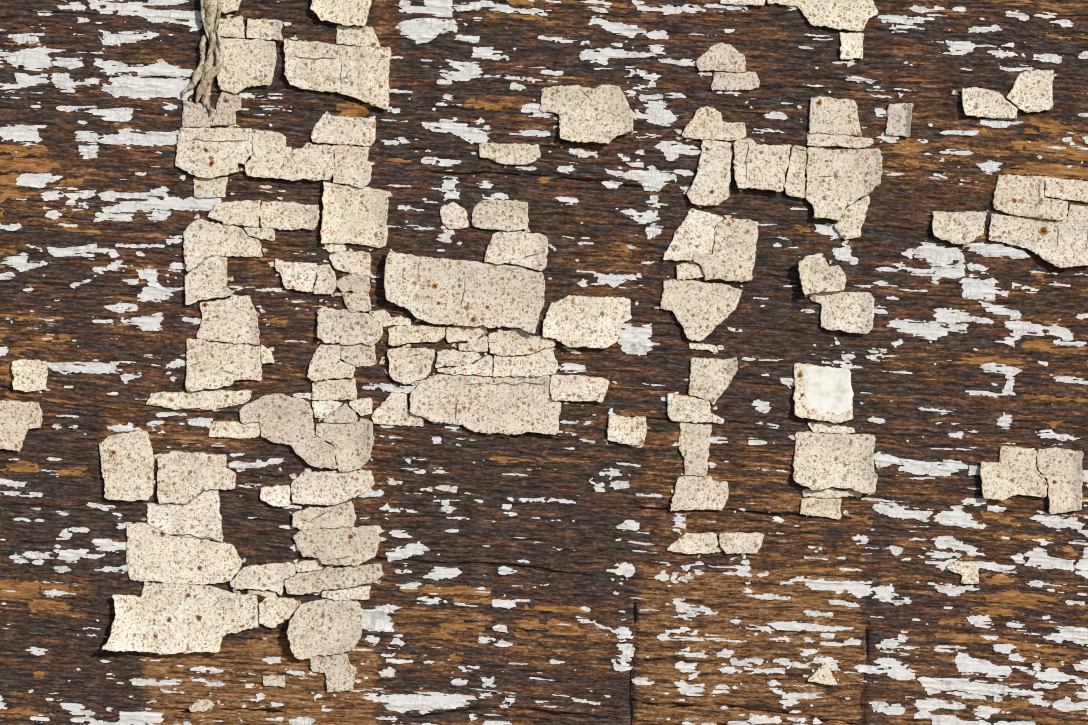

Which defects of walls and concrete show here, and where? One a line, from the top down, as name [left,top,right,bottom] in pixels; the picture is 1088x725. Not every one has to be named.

peeling [696,42,760,91]
peeling [720,0,878,60]
peeling [0,144,87,218]
peeling [932,70,1088,282]
peeling [99,0,633,692]
peeling [660,96,931,524]
peeling [0,331,88,476]
peeling [607,415,647,446]
peeling [667,532,764,554]
peeling [980,446,1088,557]
peeling [934,561,1084,668]
peeling [807,662,837,686]